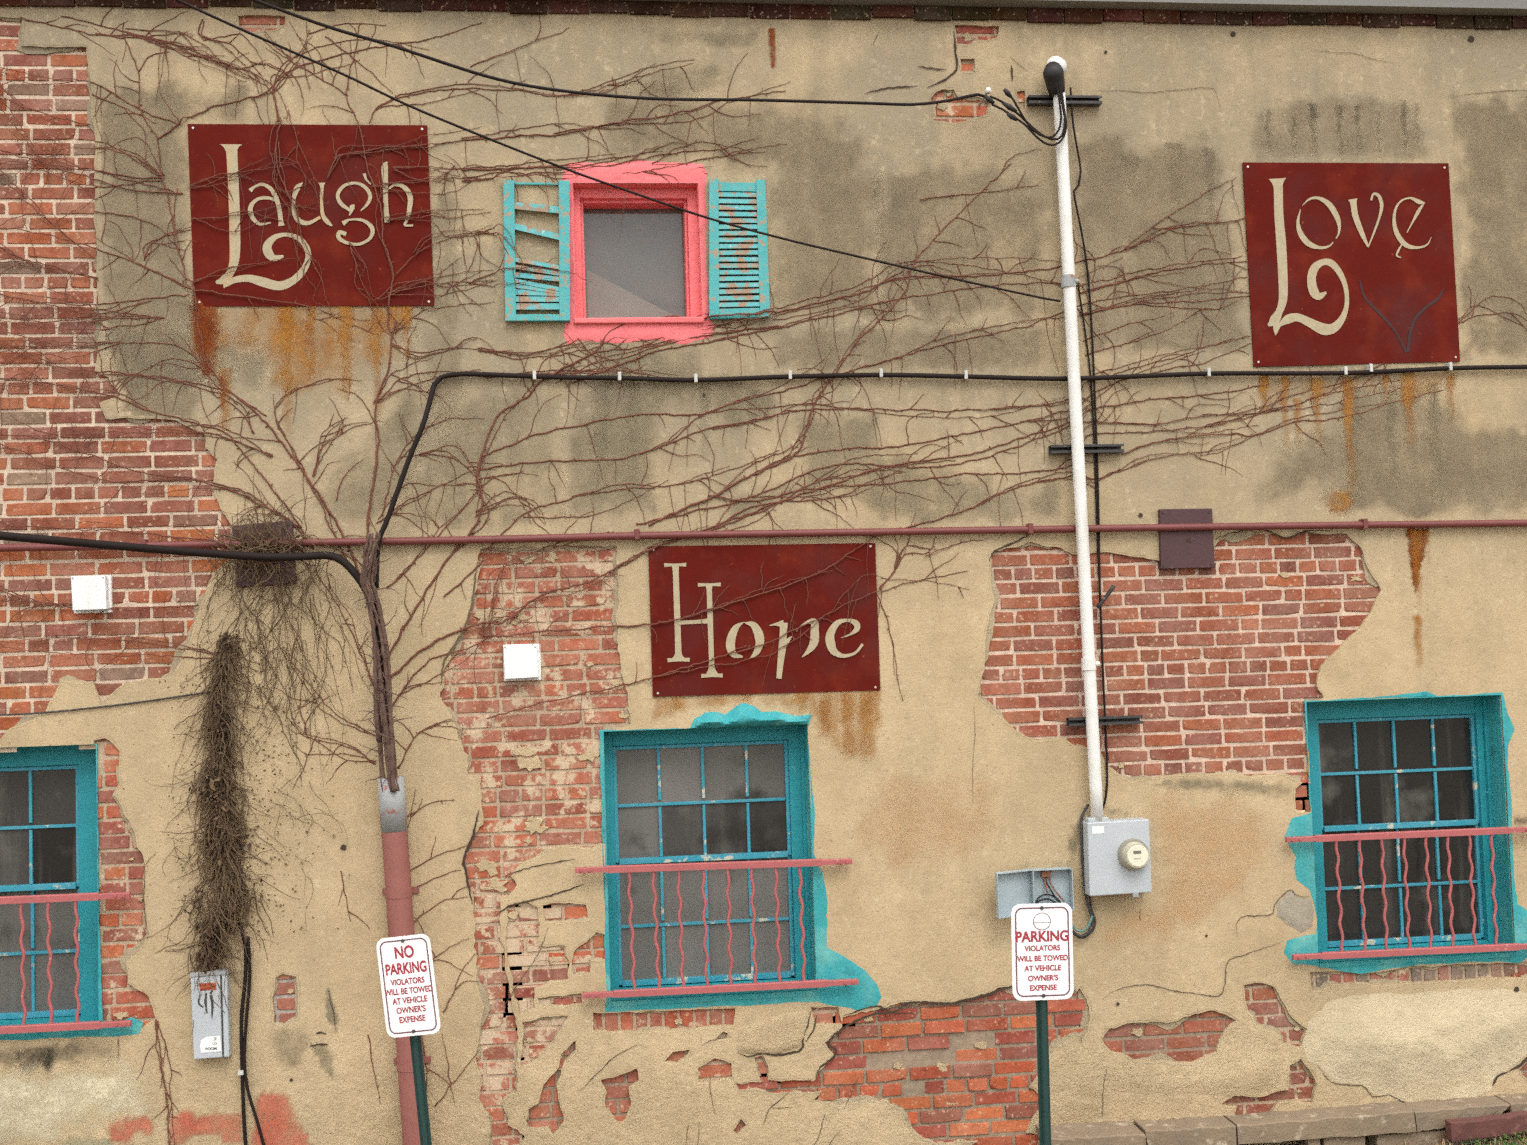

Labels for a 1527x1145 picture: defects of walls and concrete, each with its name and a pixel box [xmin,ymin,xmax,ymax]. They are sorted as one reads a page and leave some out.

damp [1454,99,1527,351]
flaking render [0,15,231,753]
rust [192,296,227,381]
rust [253,306,411,385]
rust [1406,528,1429,590]
flaking render [977,530,1383,813]
flaking render [439,543,1318,1145]
crack [1102,890,1310,1000]
flaking render [1310,959,1527,994]
crack [579,1045,636,1093]
crack [686,986,1012,1145]